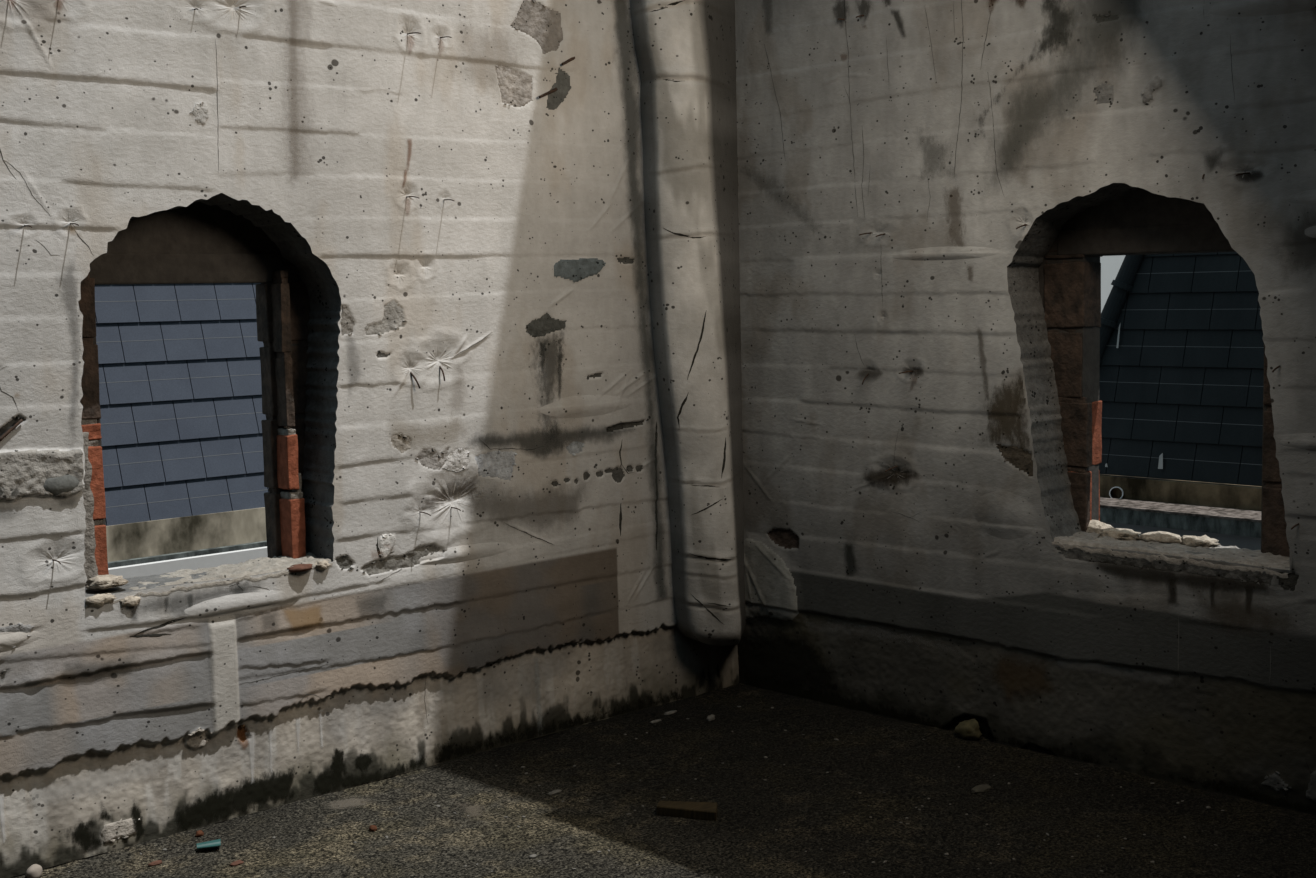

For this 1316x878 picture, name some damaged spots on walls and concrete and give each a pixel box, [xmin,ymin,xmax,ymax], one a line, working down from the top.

spalling [510,0,563,54]
spalling [496,65,571,110]
leakage [1002,0,1138,167]
spalling [0,415,26,437]
spalling [0,449,84,501]
spalling [996,444,1033,476]
leakage [131,803,145,841]
leakage [328,798,365,809]